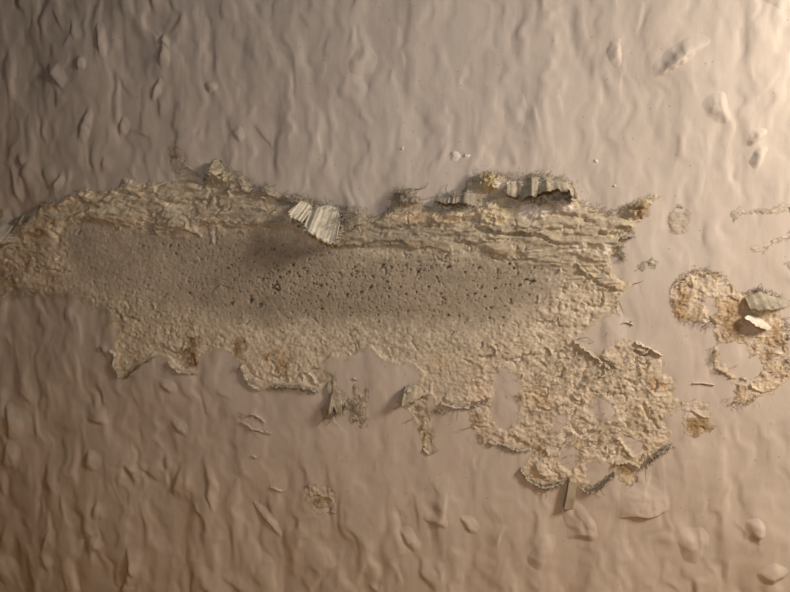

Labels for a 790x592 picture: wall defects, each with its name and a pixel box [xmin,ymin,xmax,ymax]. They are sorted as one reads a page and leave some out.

peeling [731,204,790,222]
peeling [0,146,717,498]
peeling [669,265,790,410]
peeling [304,483,337,518]